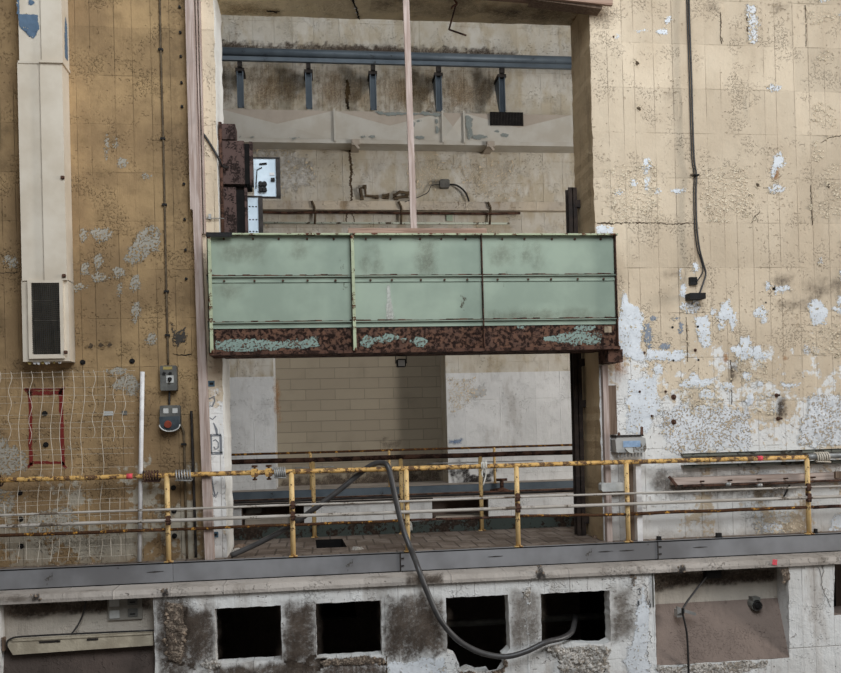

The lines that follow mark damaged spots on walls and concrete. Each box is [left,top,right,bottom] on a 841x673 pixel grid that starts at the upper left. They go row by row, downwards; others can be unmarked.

peeling [744,3,760,44]
peeling [596,158,664,233]
peeling [755,152,786,194]
peeling [74,223,162,323]
rust [208,317,619,352]
peeling [618,268,801,455]
peeling [803,295,841,358]
peeling [798,393,841,449]
damp [157,597,384,673]
damp [384,594,445,661]
spalling [545,644,611,673]